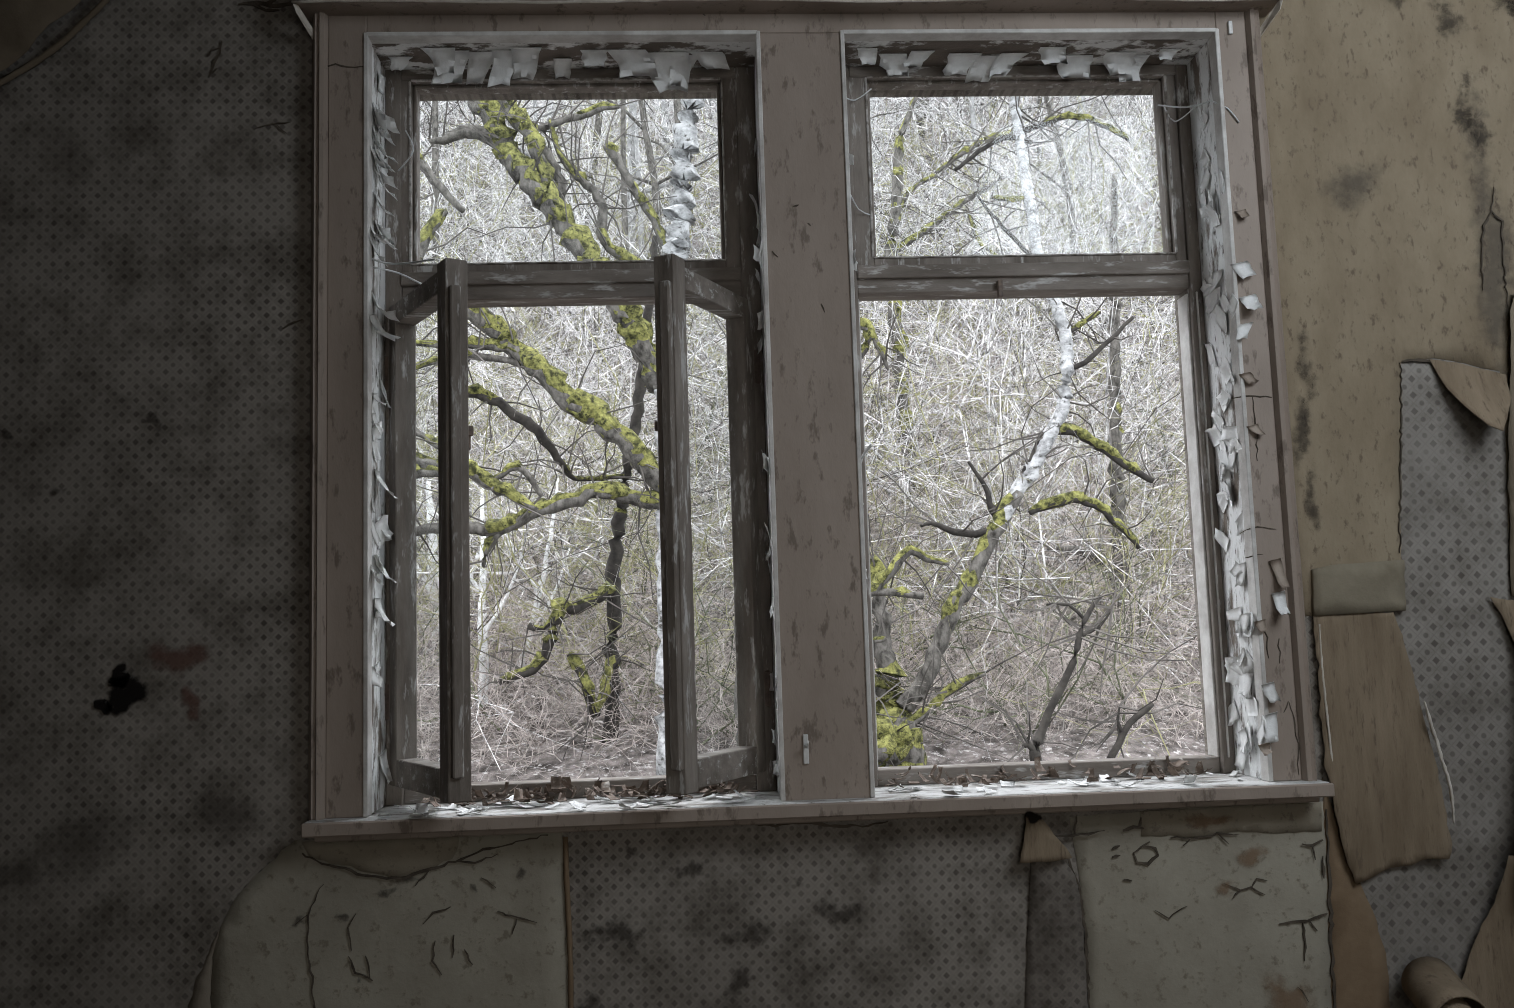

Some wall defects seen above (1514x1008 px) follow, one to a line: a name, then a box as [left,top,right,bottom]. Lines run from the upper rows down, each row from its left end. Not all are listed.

peeling [369,47,730,266]
peeling [857,47,1182,83]
peeling [1180,0,1514,783]
peeling [370,379,397,627]
flaking render [210,832,568,1008]
crack [295,834,548,1008]
peeling [378,794,684,817]
peeling [941,780,1015,795]
peeling [1055,771,1143,787]
crack [1055,815,1239,1008]
flaking render [1070,777,1390,1008]
crack [1224,809,1337,1008]